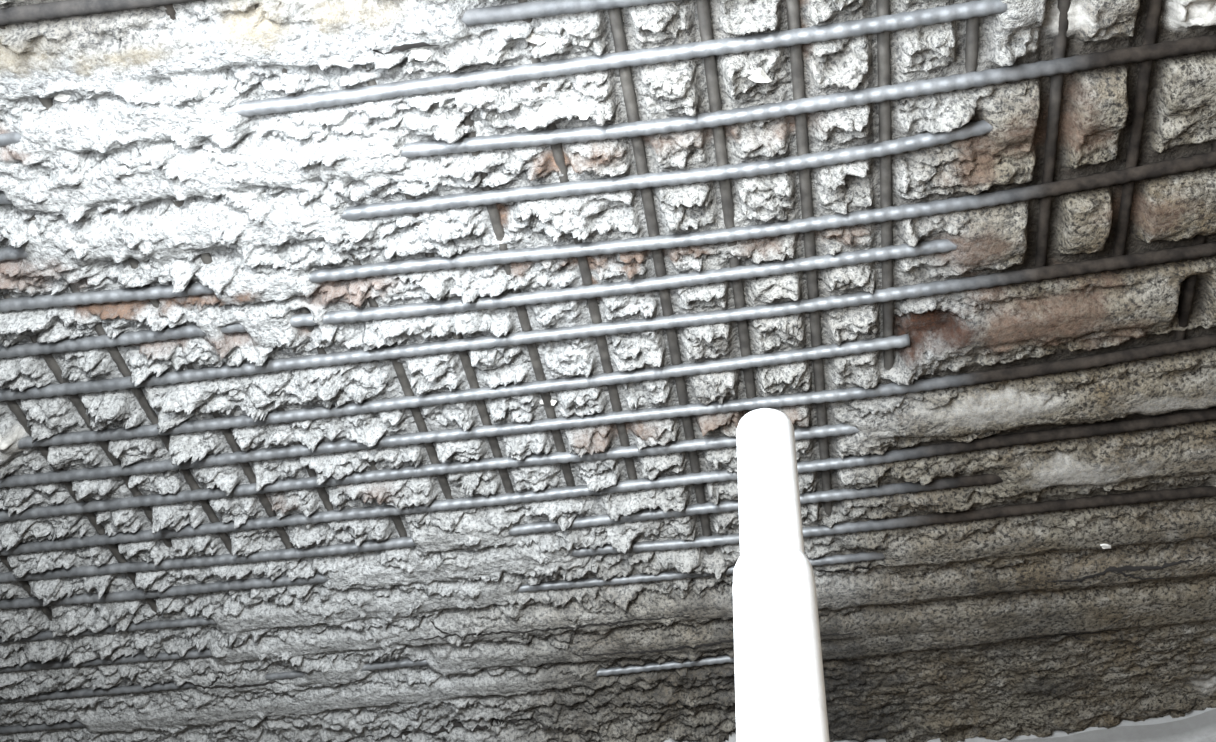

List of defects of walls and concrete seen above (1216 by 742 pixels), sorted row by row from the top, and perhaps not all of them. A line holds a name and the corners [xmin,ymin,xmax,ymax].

spalling [0,0,1216,480]
spalling [0,334,1216,742]
water stain [679,660,736,710]